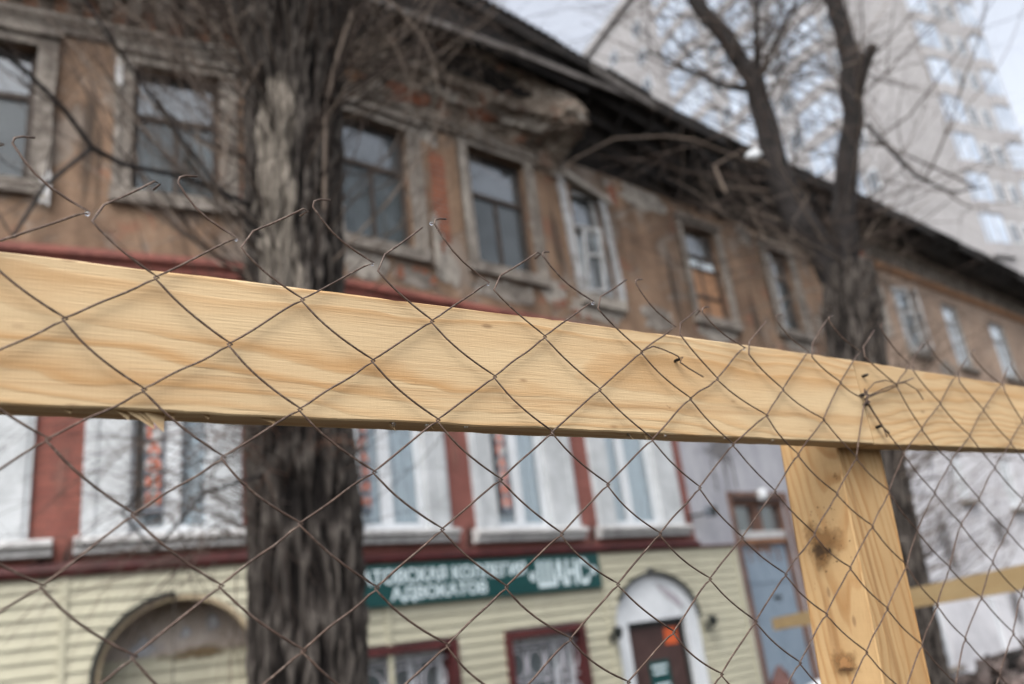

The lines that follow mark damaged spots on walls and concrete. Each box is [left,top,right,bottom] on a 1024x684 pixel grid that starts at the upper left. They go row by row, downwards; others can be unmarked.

flaking render [424,85,466,106]
flaking render [398,36,533,98]
flaking render [499,113,554,134]
flaking render [344,125,625,326]